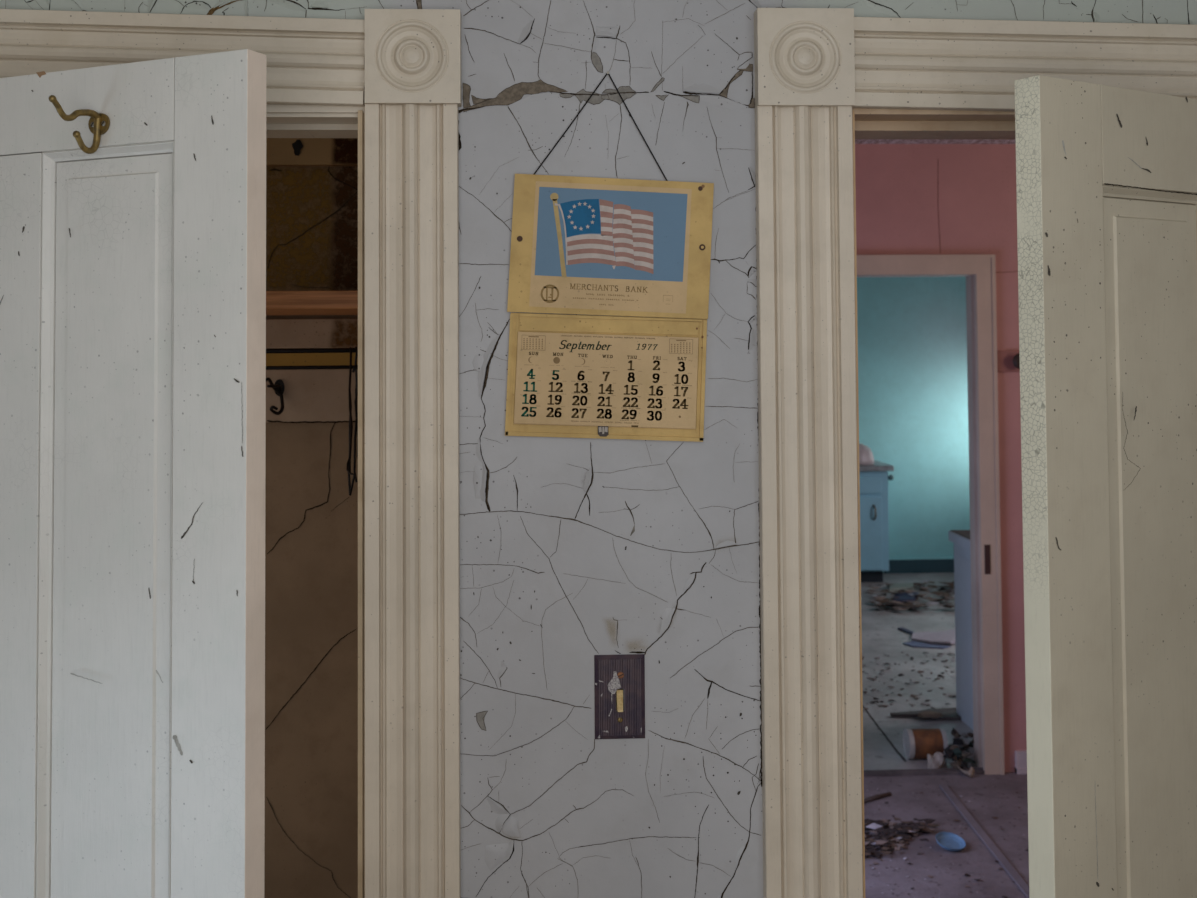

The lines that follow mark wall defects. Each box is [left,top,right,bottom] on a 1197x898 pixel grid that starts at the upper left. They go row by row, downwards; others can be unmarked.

crack [124,0,384,19]
crack [828,0,914,18]
crack [1011,0,1193,24]
spalling [591,52,603,73]
spalling [463,77,700,112]
spalling [719,64,753,98]
crack [459,0,785,898]
crack [267,423,349,554]
crack [266,629,356,729]
crack [267,798,351,898]